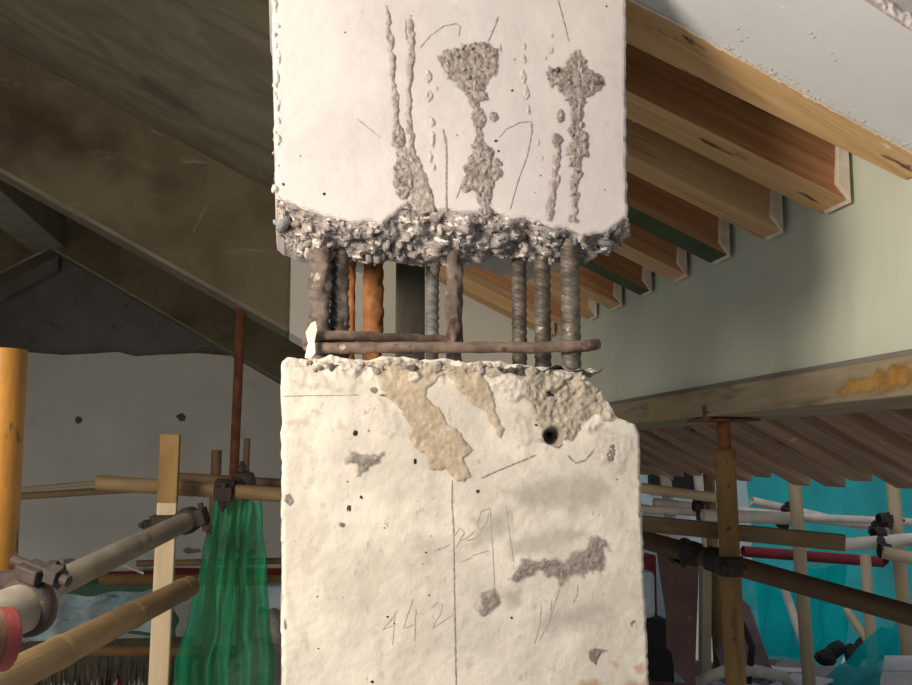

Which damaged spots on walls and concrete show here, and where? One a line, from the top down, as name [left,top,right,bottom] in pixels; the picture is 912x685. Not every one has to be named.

spalling [272,0,281,166]
spalling [271,127,631,276]
spalling [305,357,615,448]
crack [450,481,458,685]